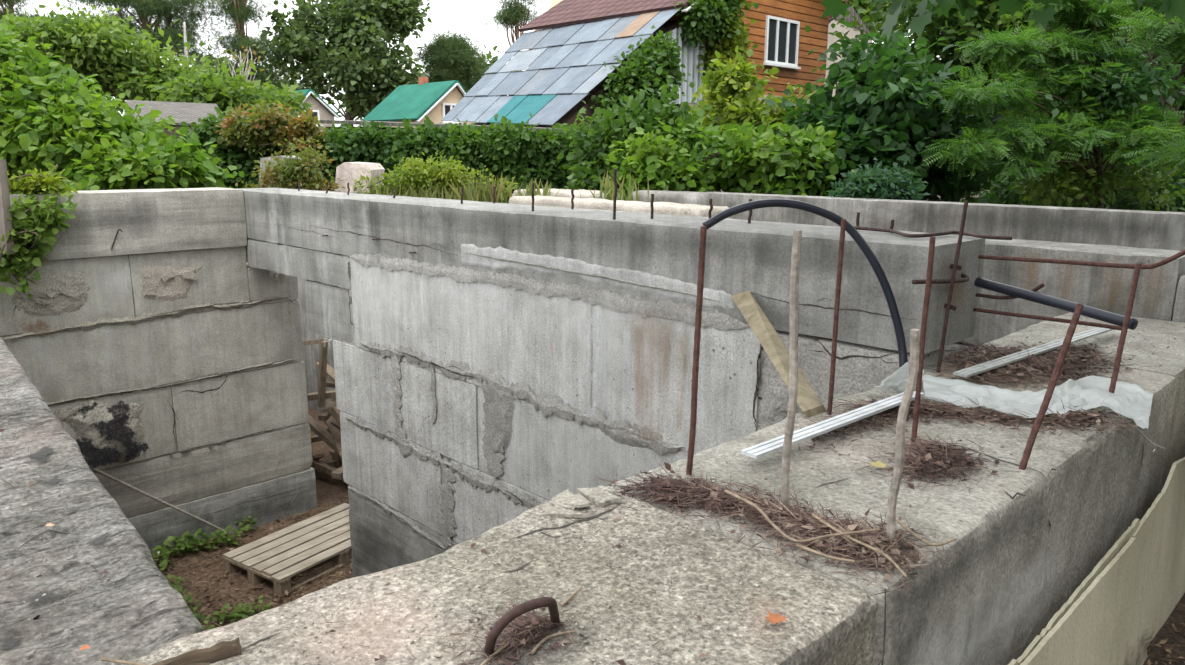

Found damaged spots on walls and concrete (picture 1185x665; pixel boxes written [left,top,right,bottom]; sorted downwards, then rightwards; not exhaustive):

spalling [9,269,91,316]
spalling [140,264,203,303]
spalling [54,399,145,432]